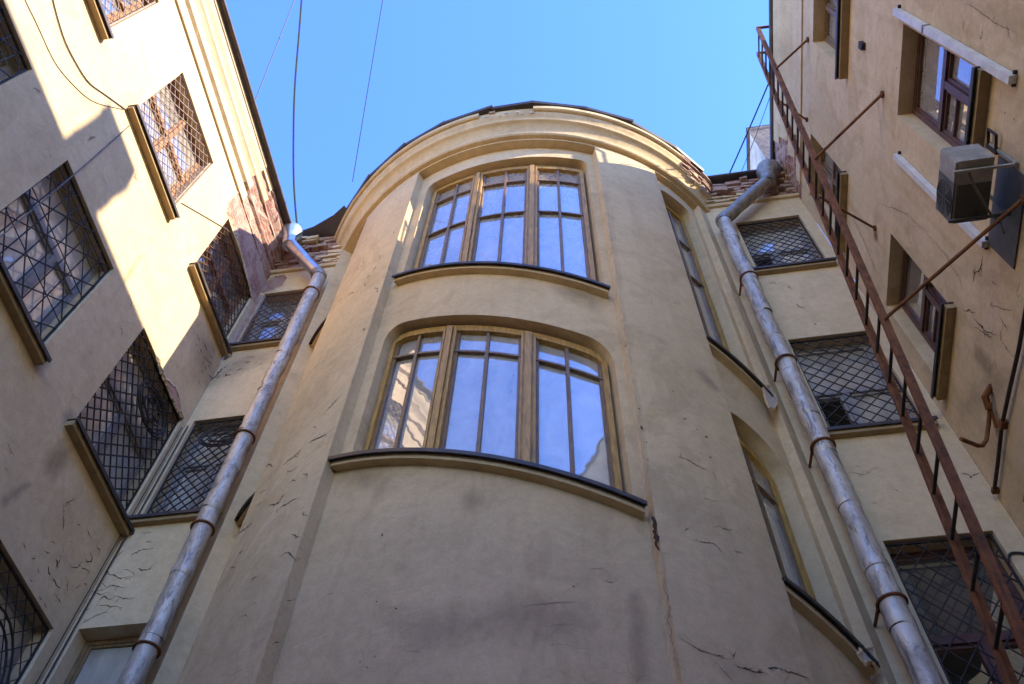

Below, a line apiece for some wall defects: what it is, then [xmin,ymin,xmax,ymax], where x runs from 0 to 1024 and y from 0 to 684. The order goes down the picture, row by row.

spalling [227,191,289,343]
crack [882,204,1022,357]
crack [23,500,151,624]
crack [231,396,340,616]
crack [680,455,741,553]
crack [658,573,810,683]